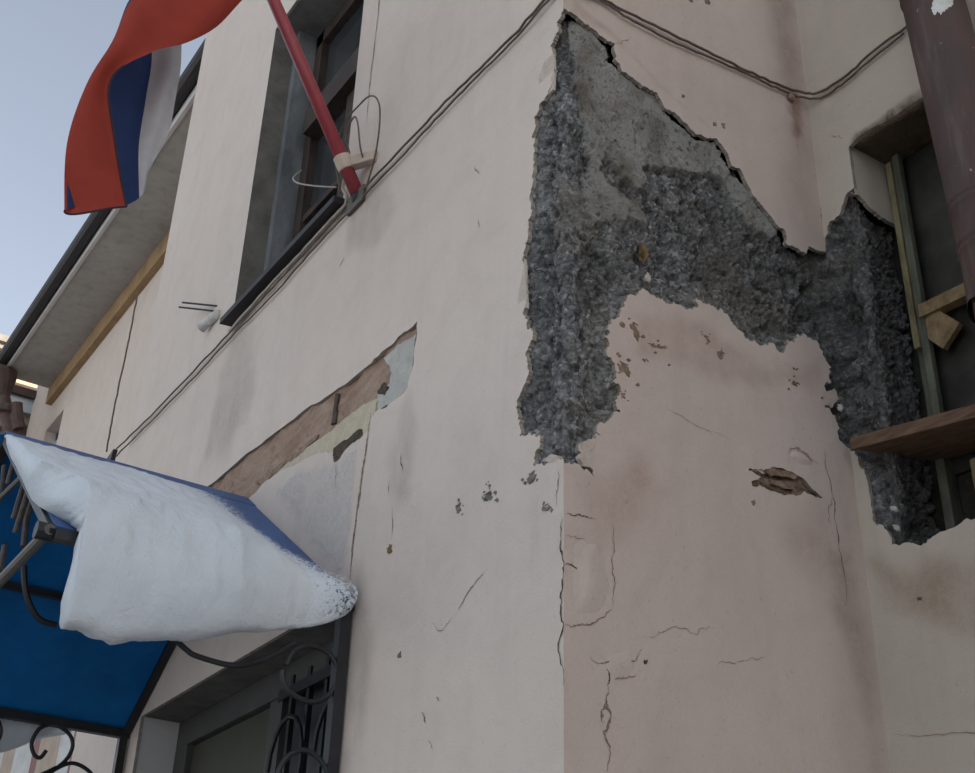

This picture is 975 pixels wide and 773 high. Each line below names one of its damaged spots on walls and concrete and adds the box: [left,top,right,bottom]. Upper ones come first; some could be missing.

flaking render [518,20,940,545]
flaking render [211,328,417,499]
flaking render [481,481,499,502]
crack [556,473,590,684]
crack [824,452,847,600]
crack [601,687,612,770]